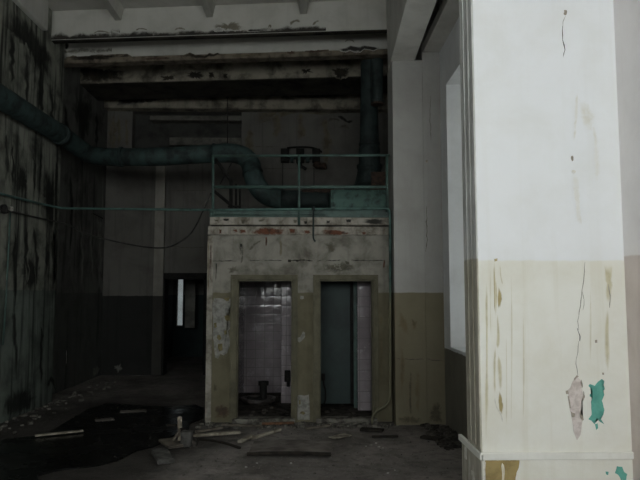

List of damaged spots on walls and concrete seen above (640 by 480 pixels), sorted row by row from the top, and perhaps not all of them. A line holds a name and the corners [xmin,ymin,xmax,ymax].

leakage [0,6,326,119]
leakage [0,133,59,418]
peeling [212,297,230,359]
leakage [485,258,513,439]
crack [576,264,585,375]
leakage [604,264,613,372]
peeling [566,373,605,439]
peeling [483,460,520,480]
peeling [606,466,627,480]